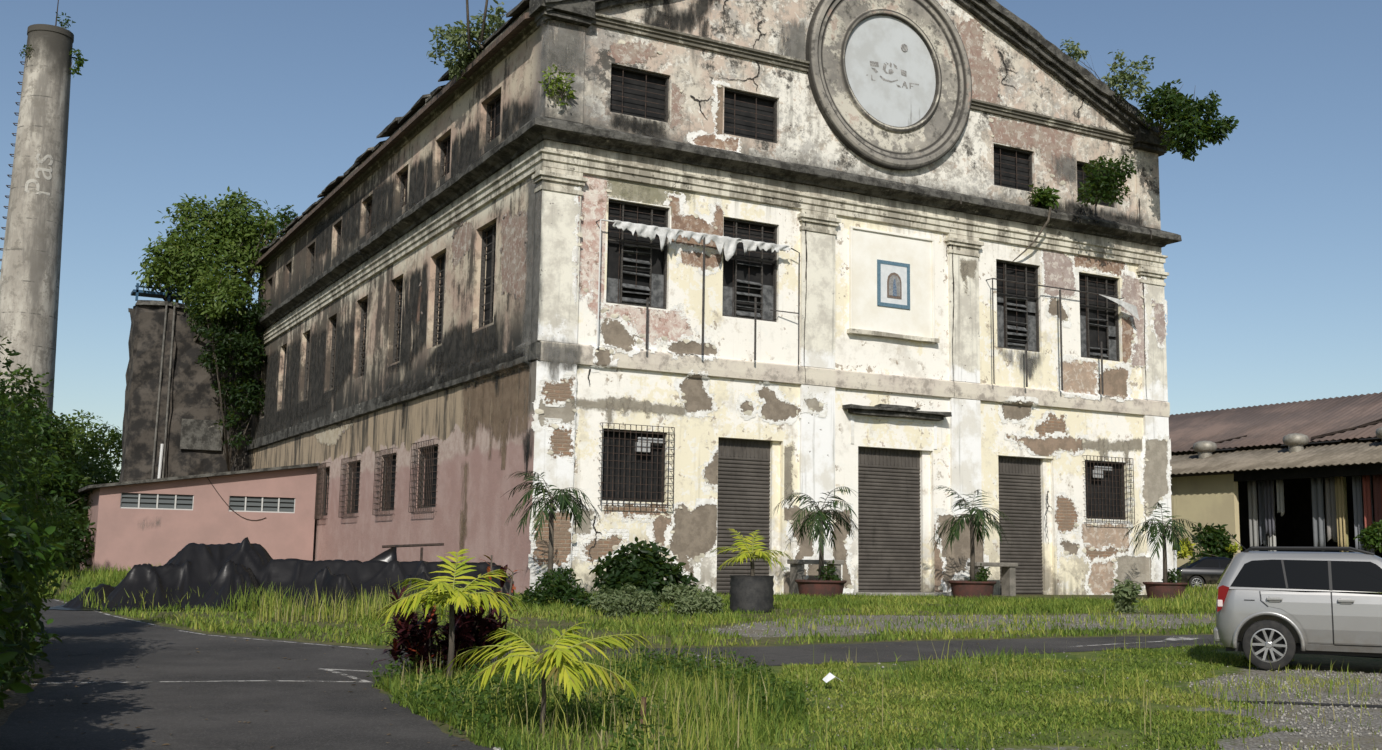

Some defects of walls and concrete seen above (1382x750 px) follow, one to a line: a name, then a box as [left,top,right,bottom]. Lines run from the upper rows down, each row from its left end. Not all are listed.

water stain [644,0,720,38]
water stain [312,101,532,261]
water stain [257,321,354,438]
water stain [382,179,580,563]
peeling [531,174,725,464]
spalling [736,380,828,426]
peeling [998,249,1168,459]
spalling [528,445,718,583]
spalling [1054,433,1172,595]